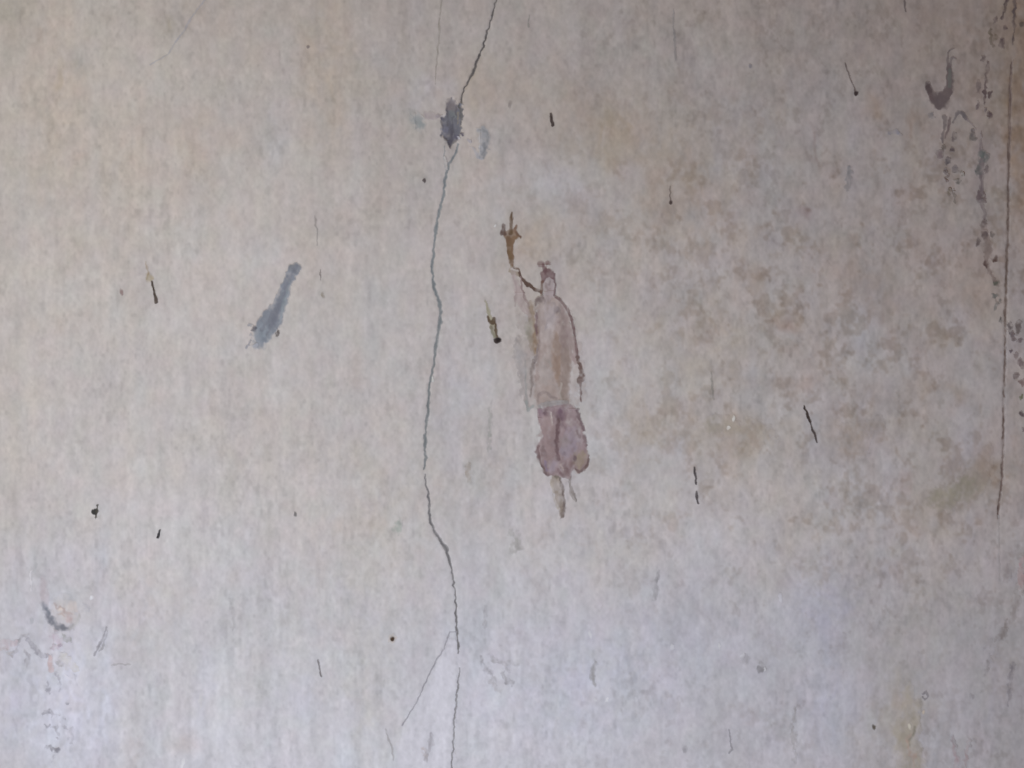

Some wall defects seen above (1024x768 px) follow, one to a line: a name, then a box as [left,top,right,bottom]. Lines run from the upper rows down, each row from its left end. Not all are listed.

crack [460,0,498,103]
leakage [469,125,491,160]
leakage [245,262,302,351]
crack [401,143,461,768]